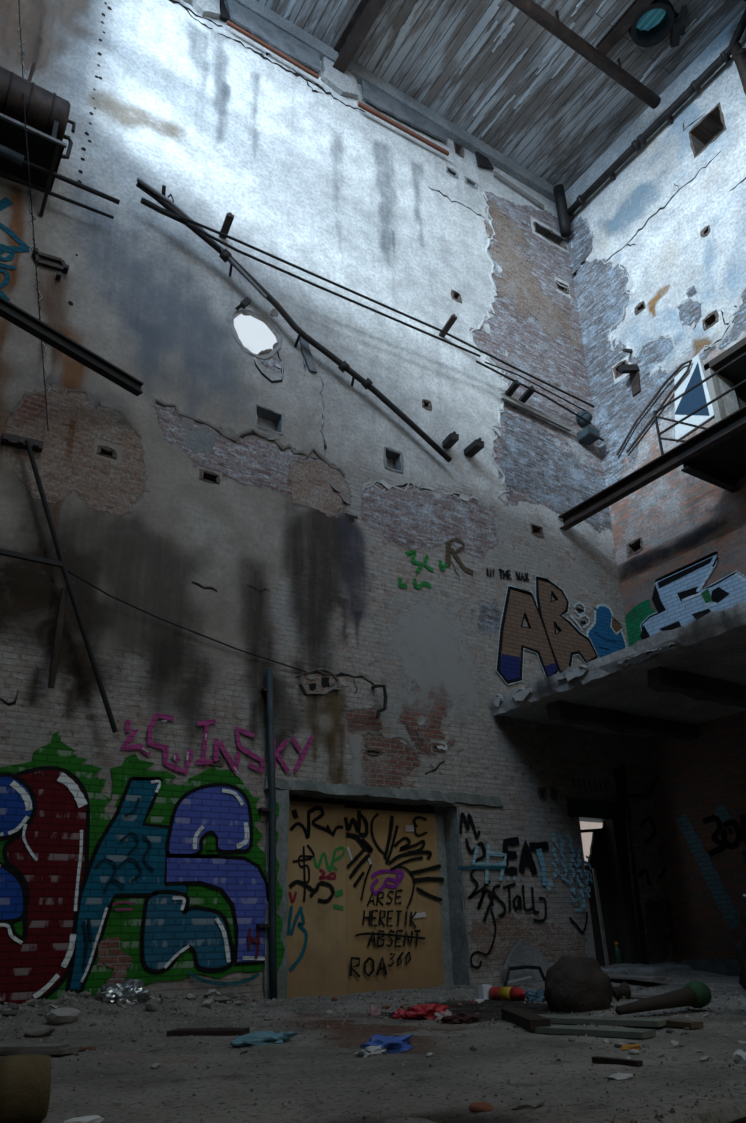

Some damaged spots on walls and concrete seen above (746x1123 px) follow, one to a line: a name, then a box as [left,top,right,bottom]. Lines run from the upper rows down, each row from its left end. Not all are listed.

peeling [377,0,439,77]
spalling [453,141,464,158]
peeling [459,0,519,75]
peeling [466,40,575,136]
crack [516,150,721,291]
spalling [150,166,677,560]
spalling [677,284,746,359]
spalling [1,373,150,516]
damp [0,502,206,726]
damp [244,570,344,760]
damp [286,510,365,676]
spalling [346,680,455,789]